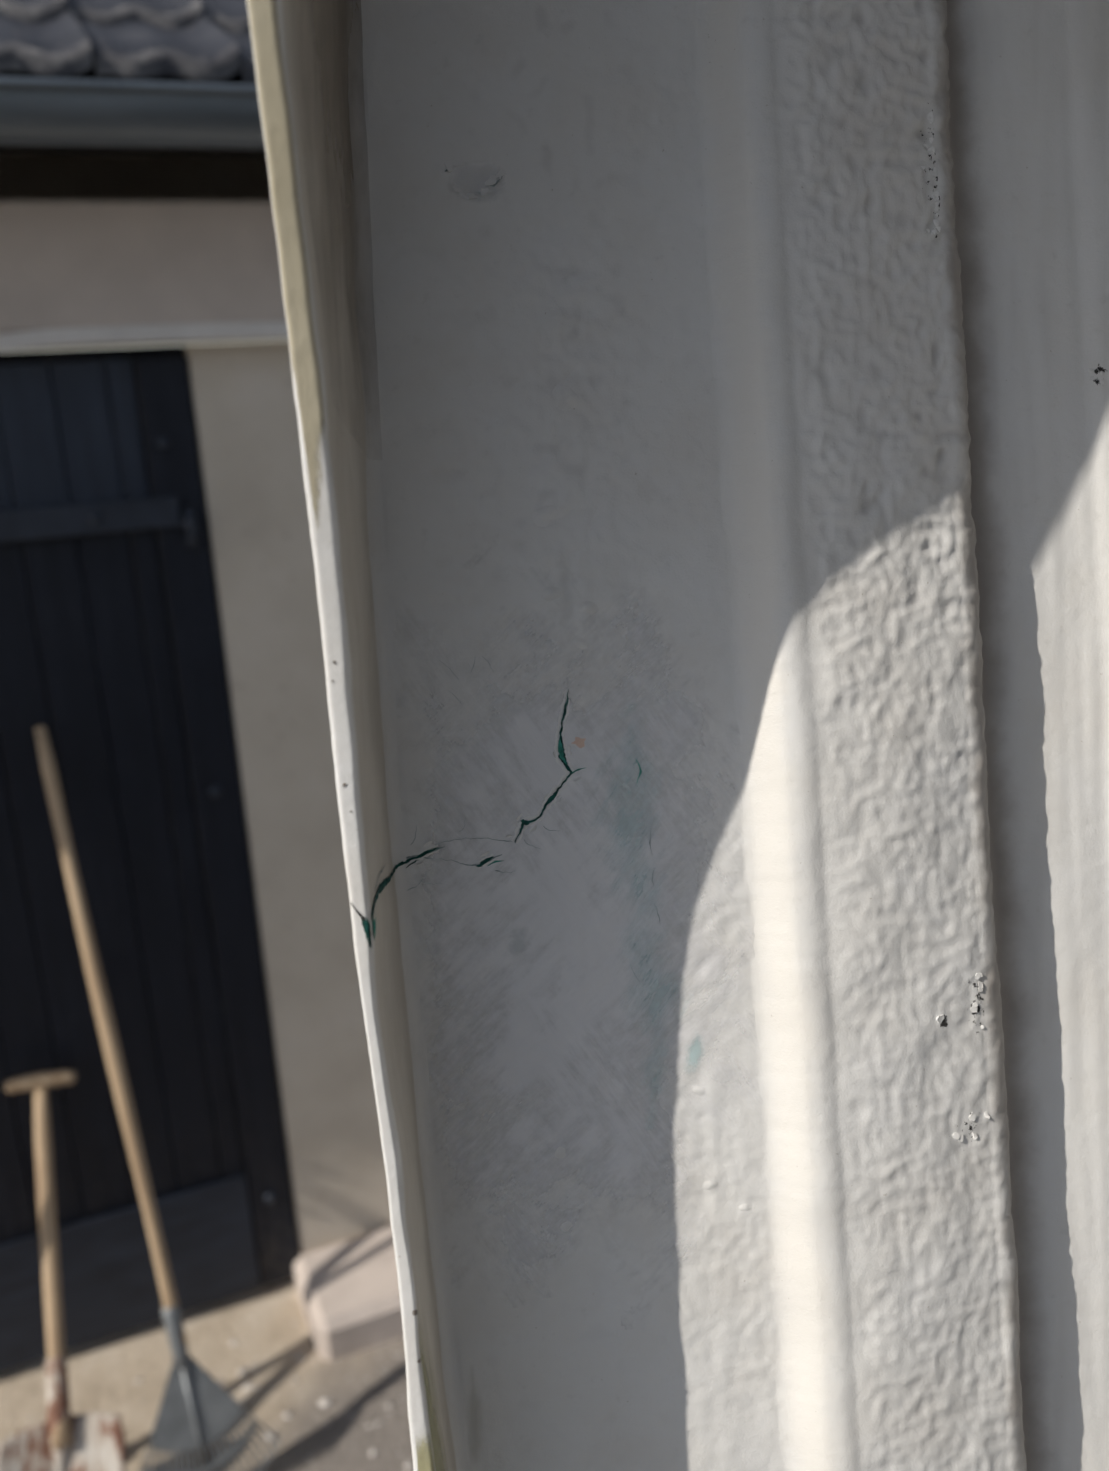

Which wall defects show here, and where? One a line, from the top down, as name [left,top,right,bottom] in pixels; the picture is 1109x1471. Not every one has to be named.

crack [350,689,586,948]